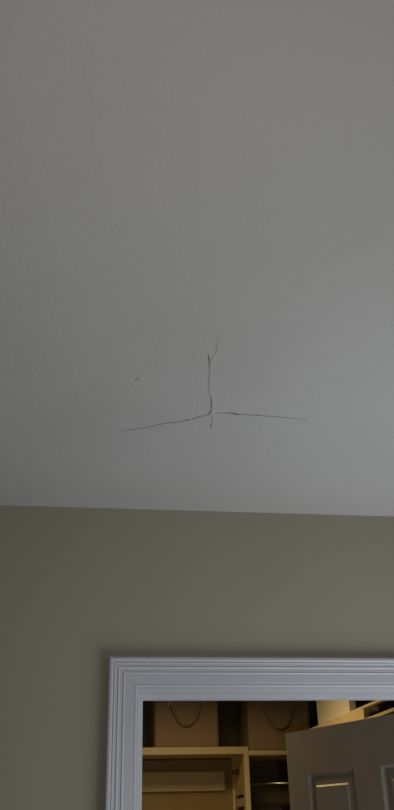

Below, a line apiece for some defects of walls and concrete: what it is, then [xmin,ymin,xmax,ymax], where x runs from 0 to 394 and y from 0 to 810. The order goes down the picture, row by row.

crack [125,335,303,431]